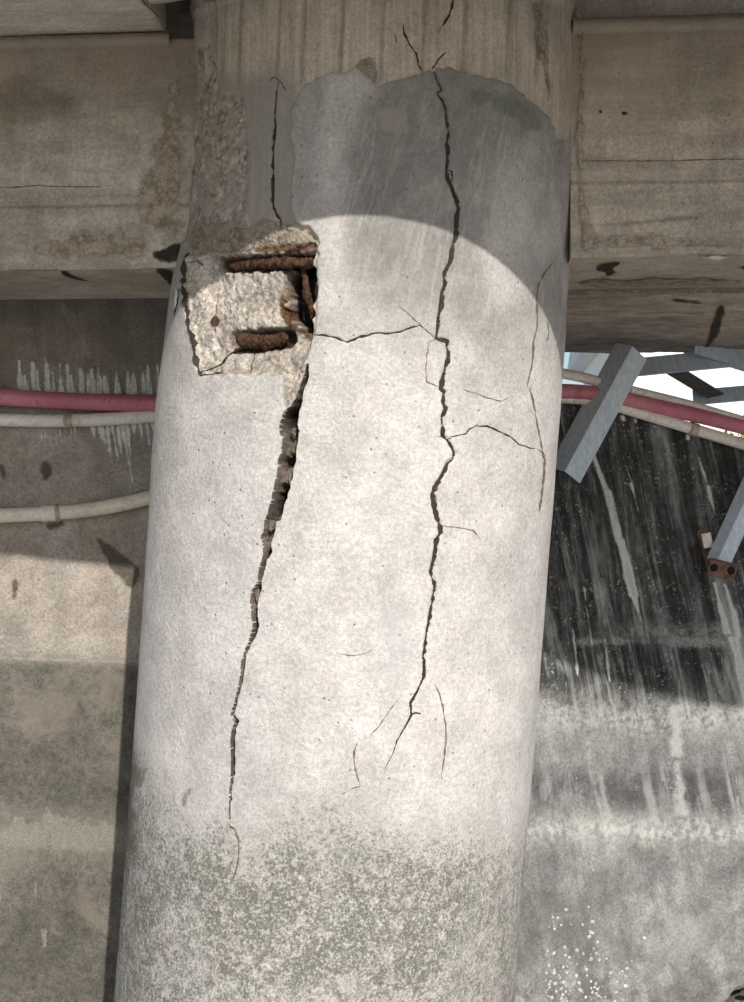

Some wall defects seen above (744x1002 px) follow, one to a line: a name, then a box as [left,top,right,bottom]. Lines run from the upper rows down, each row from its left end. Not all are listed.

crack [270,77,285,223]
spalling [34,83,318,409]
rust [255,242,316,253]
leakage [17,360,159,395]
leakage [90,422,154,481]
rust [280,295,311,337]
crack [316,0,554,794]
leakage [98,539,139,587]
crack [228,364,309,878]
leakage [593,456,639,613]
leakage [713,582,744,707]